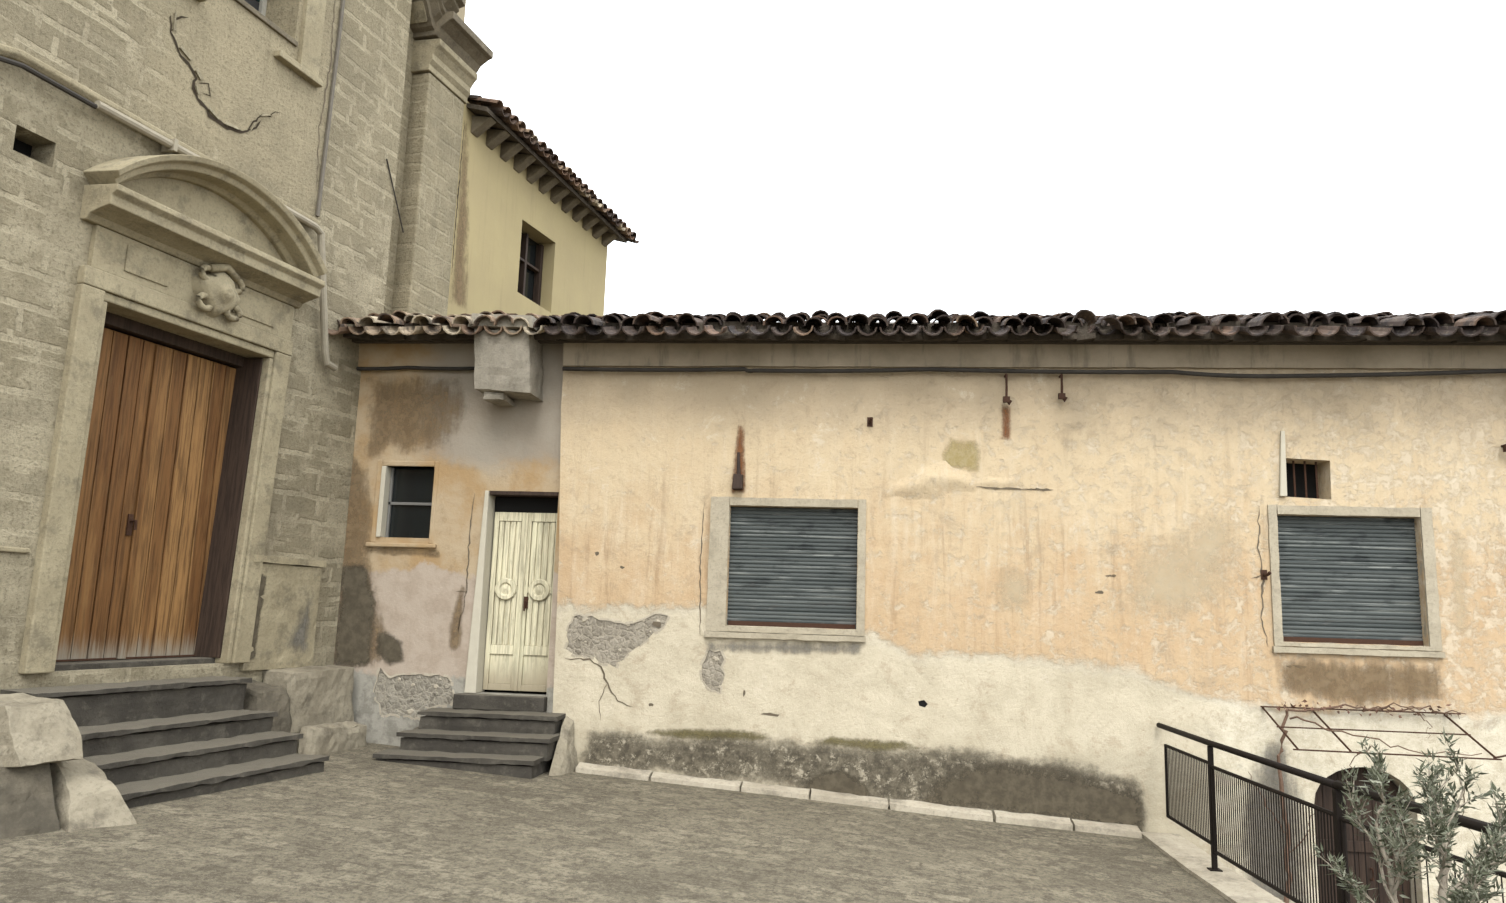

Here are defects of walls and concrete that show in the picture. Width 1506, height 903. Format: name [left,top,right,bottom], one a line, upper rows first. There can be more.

crack [170,11,279,133]
rust [732,426,745,492]
spalling [373,667,455,721]
crack [566,658,632,721]
spalling [564,612,670,668]
spalling [699,648,726,694]
leakage [583,729,1143,831]